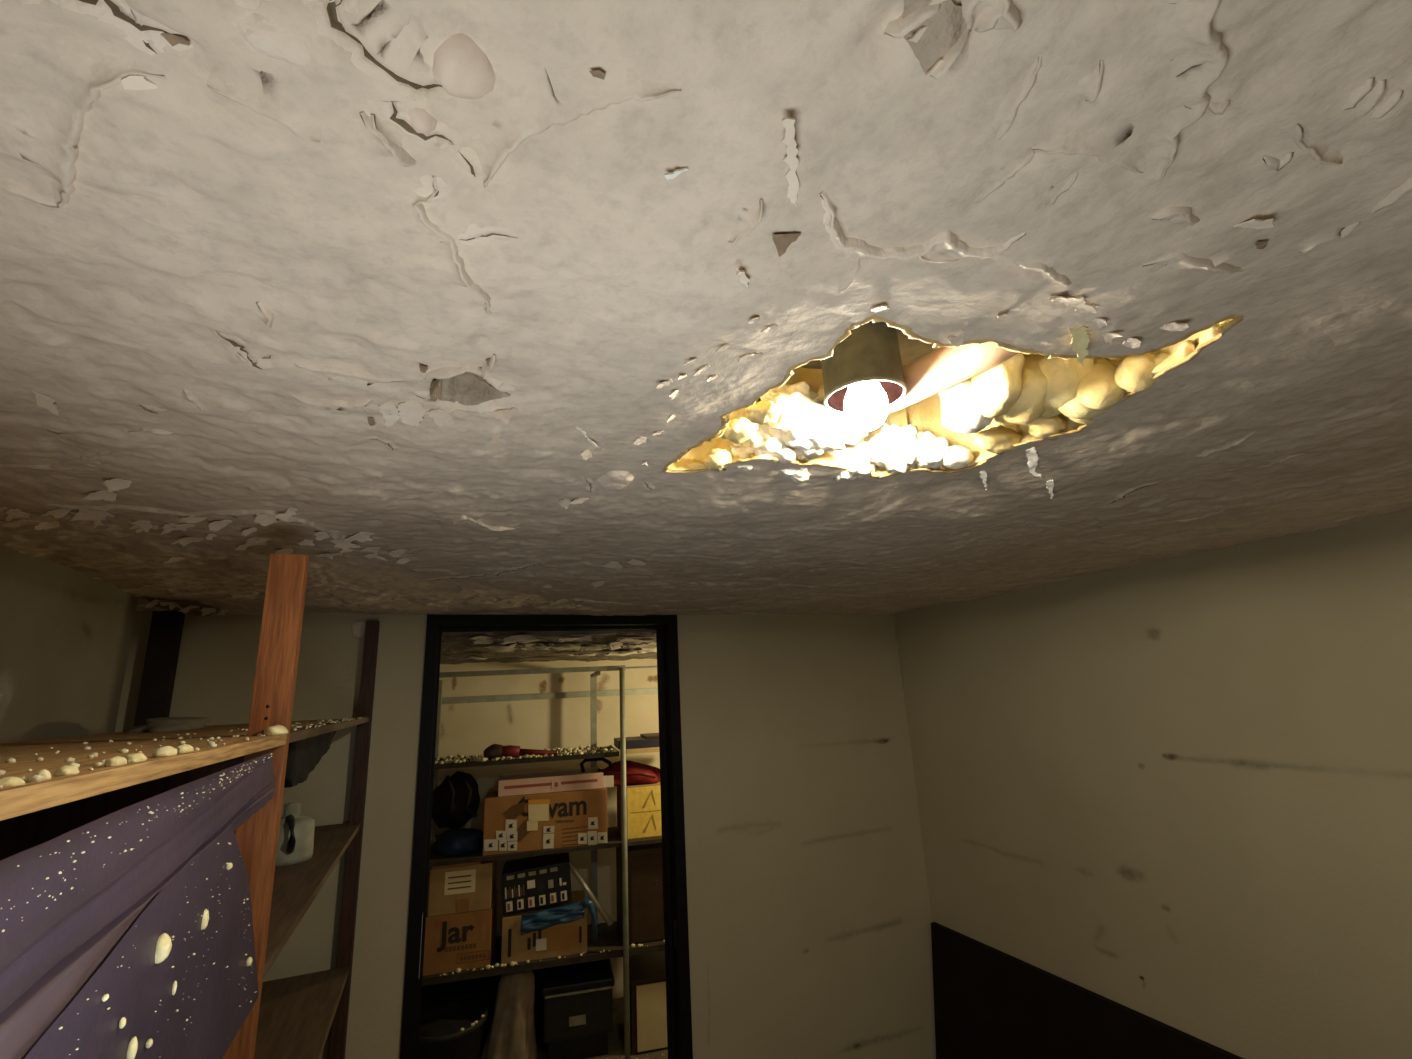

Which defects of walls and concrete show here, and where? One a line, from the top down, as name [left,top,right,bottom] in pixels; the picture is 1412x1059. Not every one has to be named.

crack [8,0,193,55]
crack [311,0,519,314]
peeling [1159,322,1189,331]
spalling [291,354,519,451]
peeling [633,343,763,445]
peeling [1026,446,1055,499]